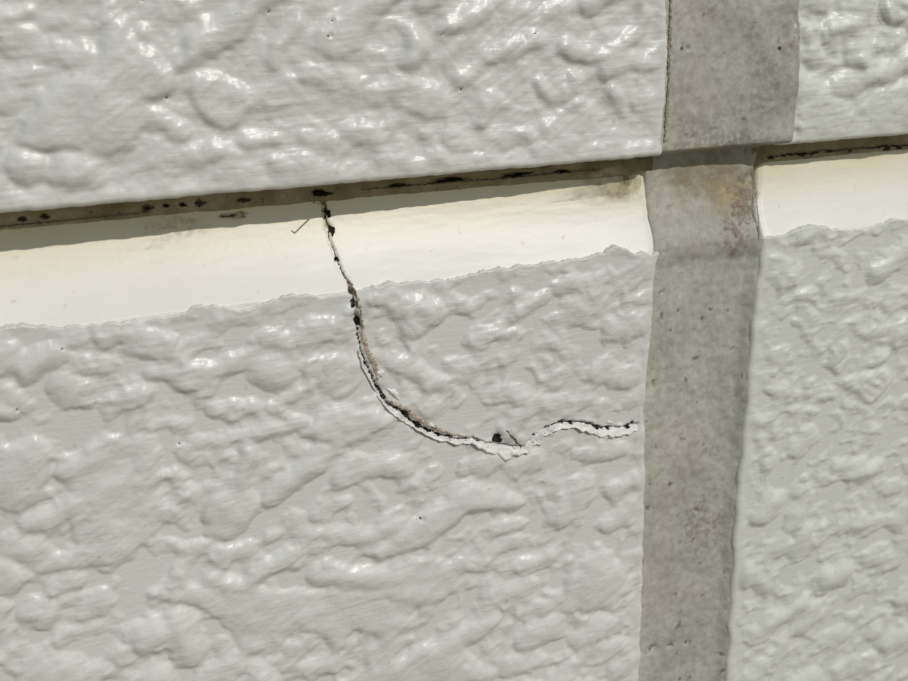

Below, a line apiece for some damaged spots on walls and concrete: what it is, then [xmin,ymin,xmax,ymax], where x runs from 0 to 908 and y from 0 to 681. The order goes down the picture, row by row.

crack [312,190,639,462]